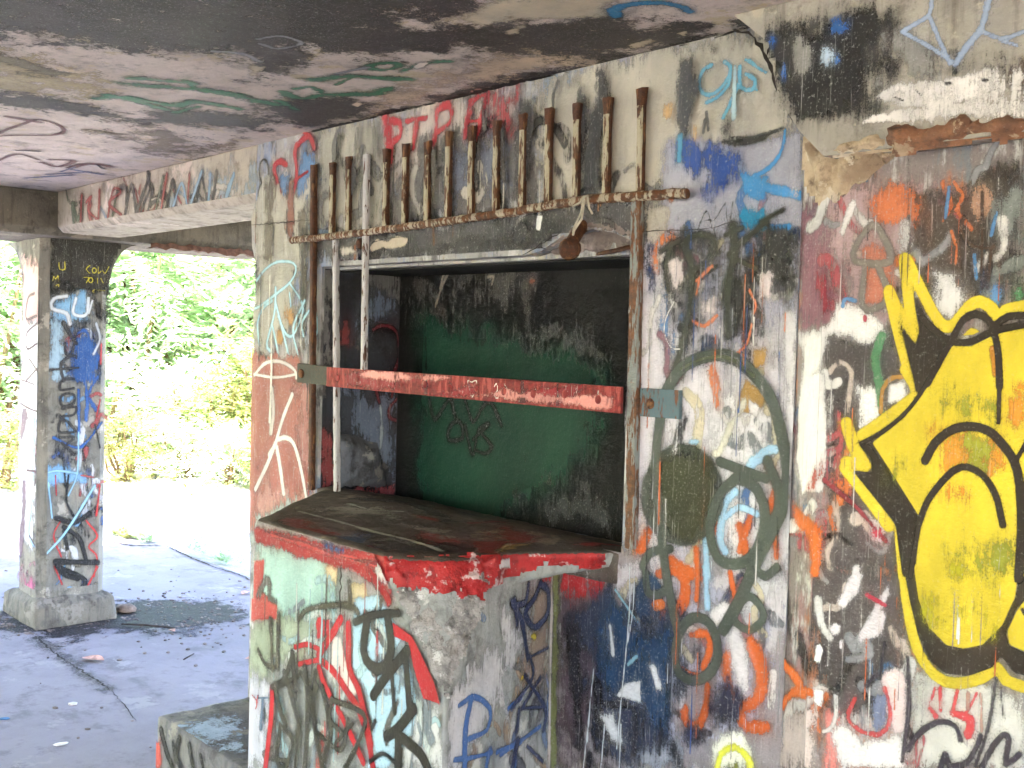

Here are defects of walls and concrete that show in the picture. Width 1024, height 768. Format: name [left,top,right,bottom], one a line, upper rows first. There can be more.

crack [311,72,568,132]
crack [679,29,793,121]
peeling [802,65,1024,206]
peeling [323,270,400,371]
spalling [277,388,545,699]
crack [35,636,136,720]